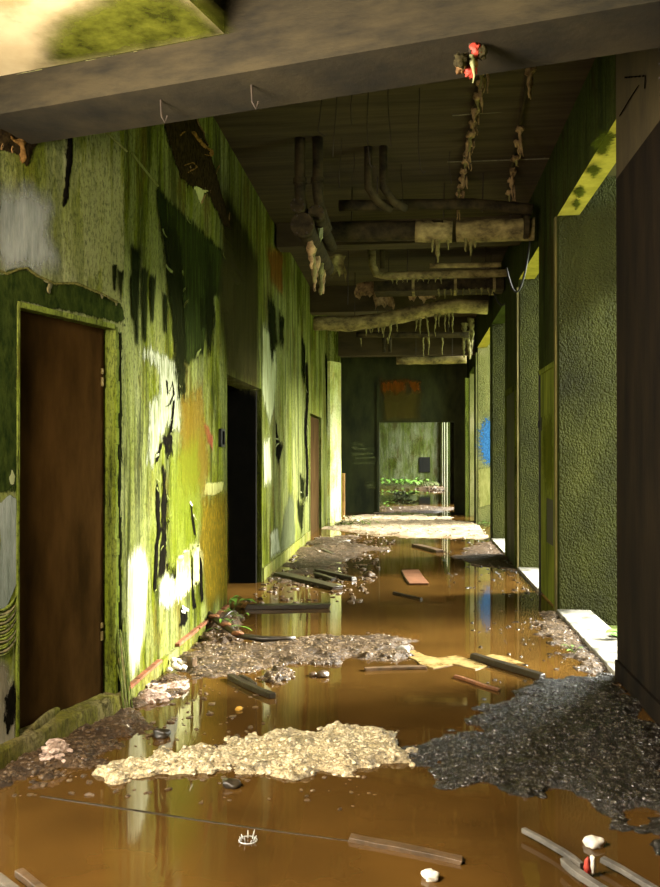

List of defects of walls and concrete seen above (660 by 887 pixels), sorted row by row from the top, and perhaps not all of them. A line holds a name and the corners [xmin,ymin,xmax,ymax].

water stain [0,191,57,269]
water stain [112,216,190,401]
water stain [201,194,285,389]
peeling [0,267,125,657]
water stain [128,550,148,676]
peeling [139,346,204,629]
peeling [204,482,223,495]
water stain [200,492,228,609]